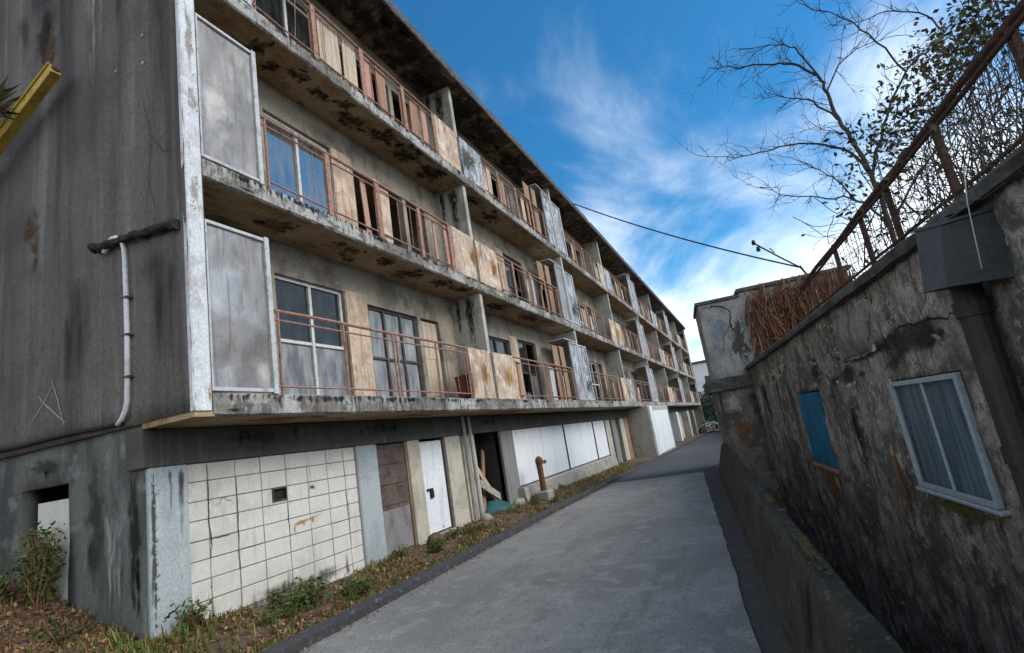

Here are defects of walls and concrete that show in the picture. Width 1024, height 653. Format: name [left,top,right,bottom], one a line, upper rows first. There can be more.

water stain [270,22,411,133]
water stain [426,92,444,122]
crack [701,305,742,358]
crack [805,304,954,458]
spalling [872,315,943,369]
water stain [88,481,141,611]